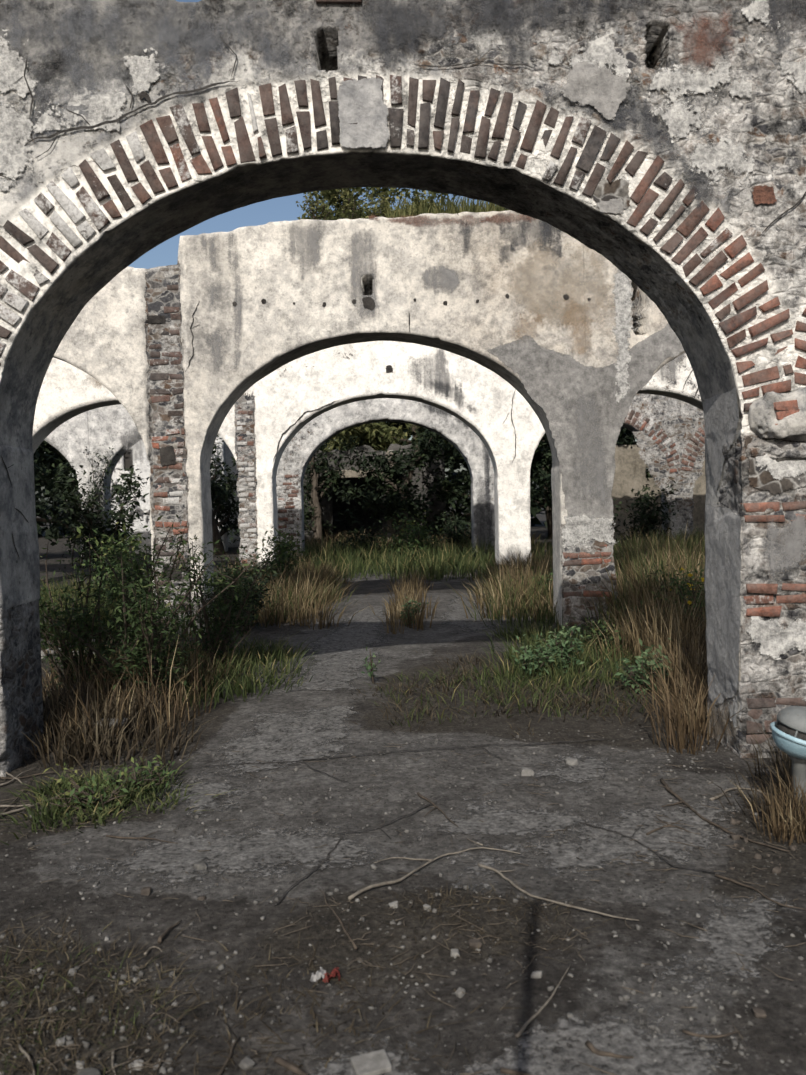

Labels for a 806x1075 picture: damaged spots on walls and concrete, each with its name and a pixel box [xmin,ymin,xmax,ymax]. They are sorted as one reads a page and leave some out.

peeling [741,0,793,52]
peeling [548,35,631,88]
peeling [0,29,165,192]
crack [15,36,238,158]
peeling [648,19,777,204]
crack [761,192,806,235]
crack [186,303,200,370]
water stain [413,349,472,411]
peeling [633,386,806,727]